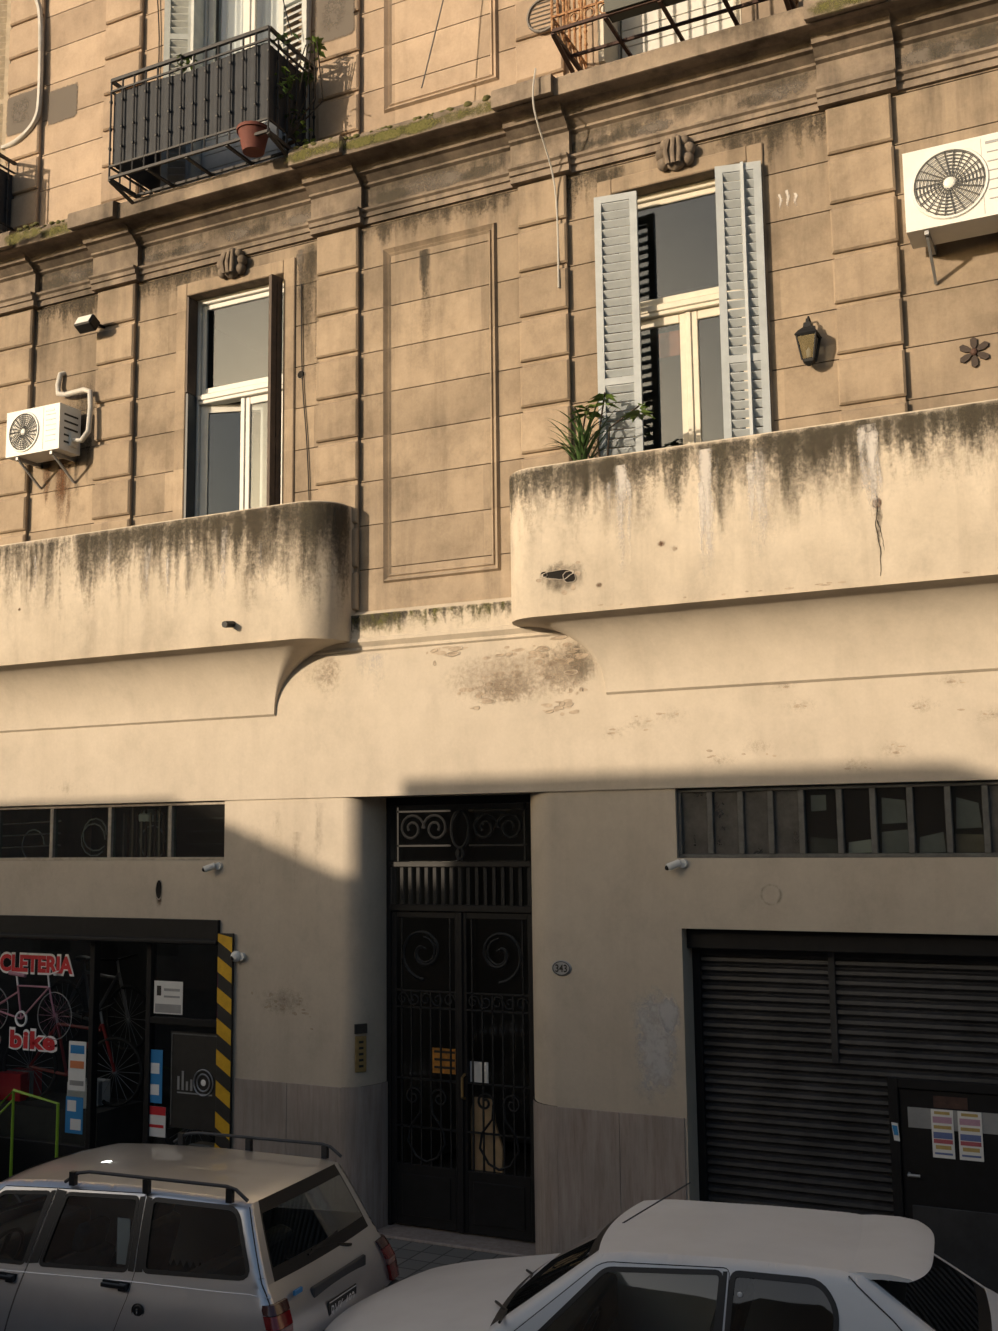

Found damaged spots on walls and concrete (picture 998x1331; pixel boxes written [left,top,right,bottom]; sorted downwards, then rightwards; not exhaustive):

leakage [509,400,998,550]
leakage [6,544,53,575]
leakage [76,501,350,582]
peeling [426,646,468,666]
peeling [457,635,588,716]